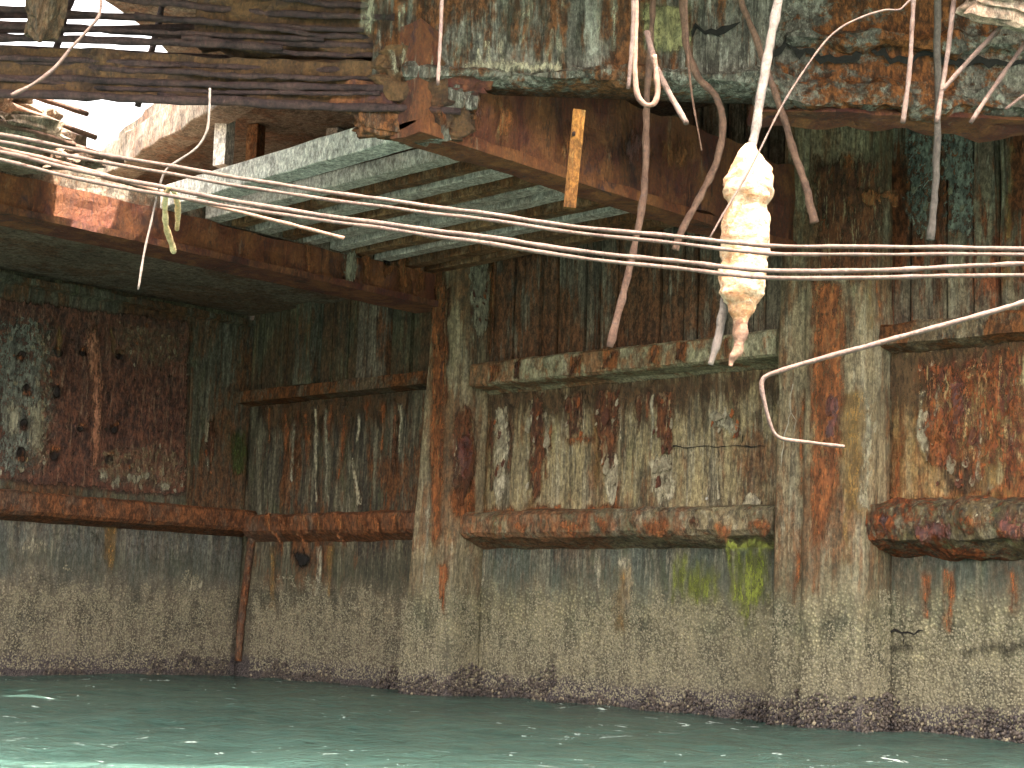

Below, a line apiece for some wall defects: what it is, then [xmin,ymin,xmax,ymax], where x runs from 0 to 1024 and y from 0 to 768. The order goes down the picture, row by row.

crack [691,22,740,37]
crack [774,37,1024,69]
spalling [0,0,1024,245]
corrosion [621,126,642,166]
corrosion [87,328,104,466]
corrosion [257,390,410,545]
corrosion [422,271,451,590]
crack [673,384,796,463]
corrosion [794,151,898,603]
corrosion [890,341,1024,500]
corrosion [438,562,449,612]
crack [890,628,924,644]